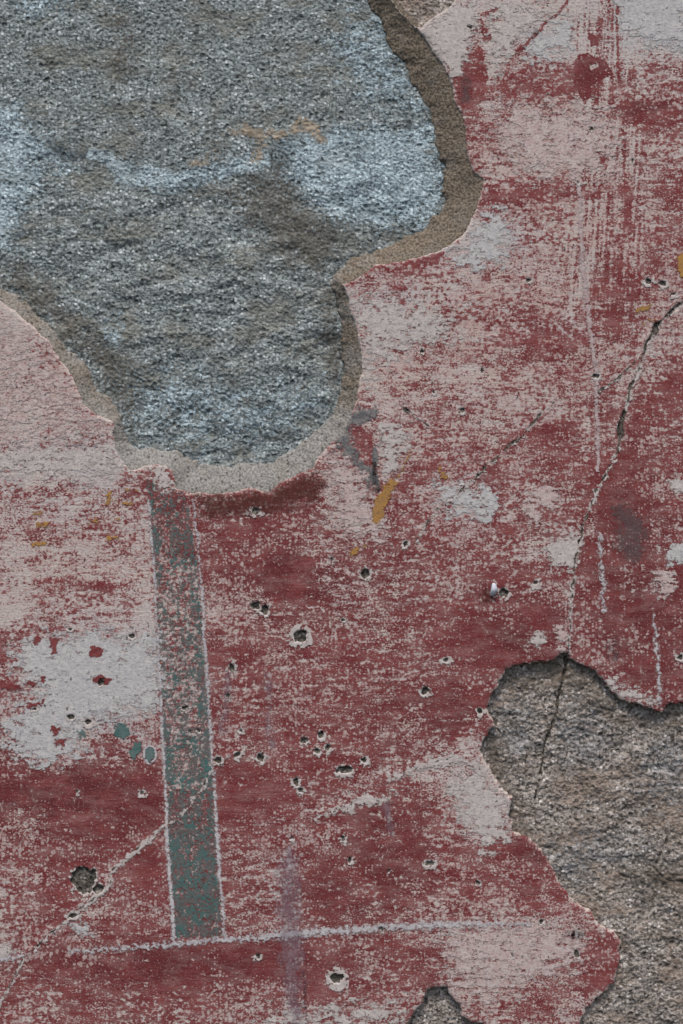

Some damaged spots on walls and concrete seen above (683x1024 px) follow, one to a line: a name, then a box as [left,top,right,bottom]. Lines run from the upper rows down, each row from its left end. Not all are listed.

spalling [0,0,635,549]
crack [414,401,555,543]
crack [534,303,682,799]
spalling [252,624,683,1024]